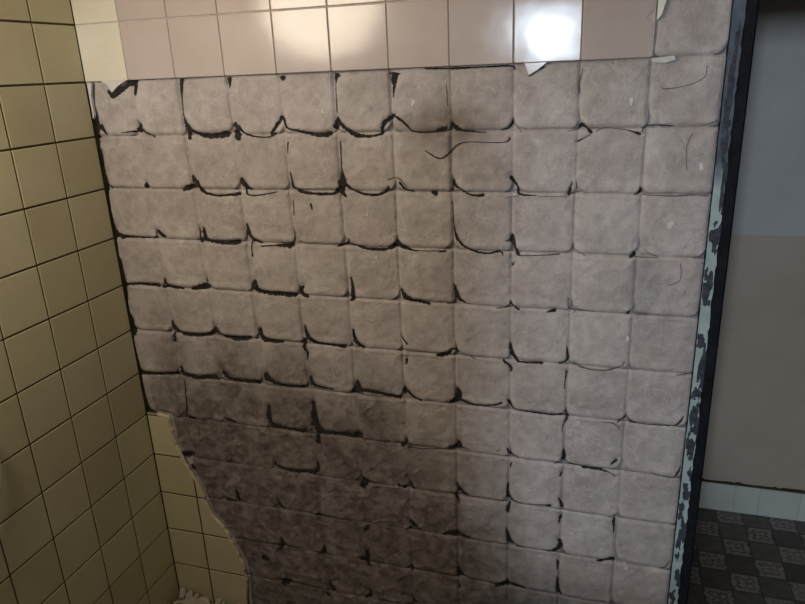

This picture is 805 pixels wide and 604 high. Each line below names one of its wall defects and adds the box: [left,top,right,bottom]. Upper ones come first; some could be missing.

flaking render [87,82,96,119]
crack [93,80,167,239]
crack [179,65,585,265]
crack [121,262,211,336]
crack [171,320,284,343]
crack [251,279,309,298]
crack [139,325,422,473]
spalling [91,0,732,604]
crack [401,284,466,305]
crack [449,387,617,477]
crack [503,342,625,389]
crack [495,447,563,595]